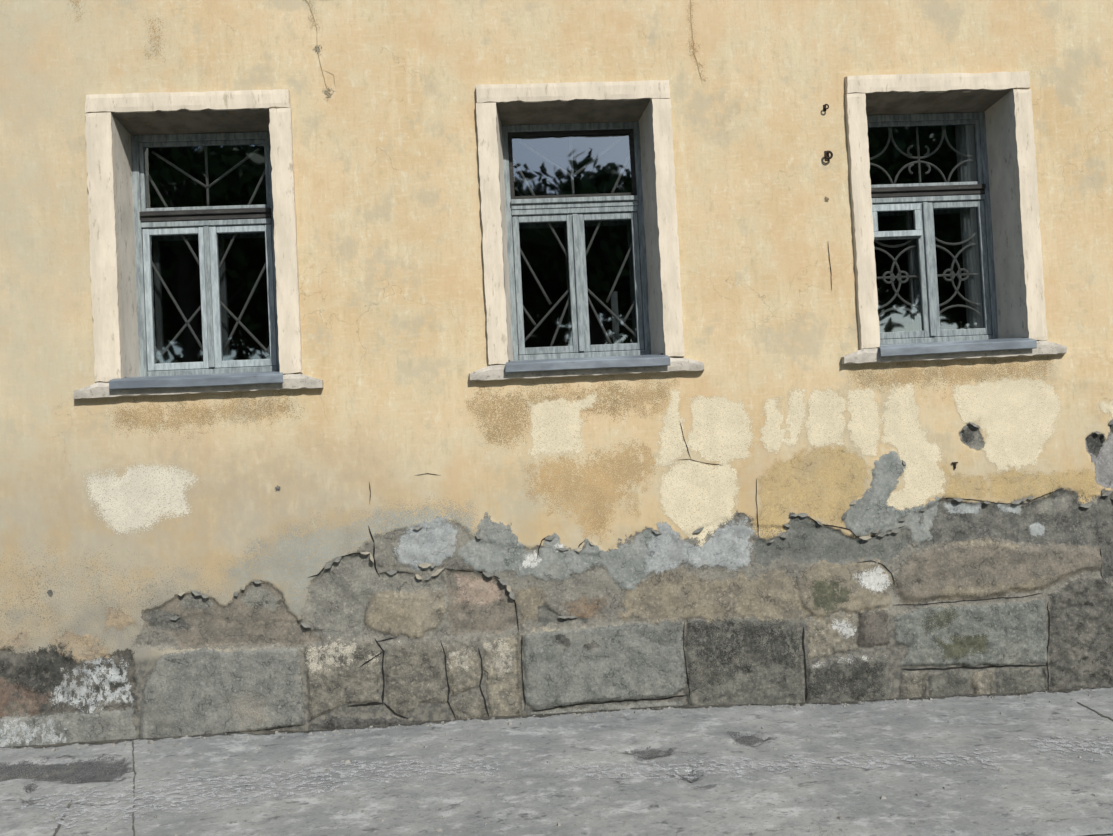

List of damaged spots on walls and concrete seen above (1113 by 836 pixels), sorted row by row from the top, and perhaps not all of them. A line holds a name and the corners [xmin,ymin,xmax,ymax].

crack [305,0,335,98]
crack [685,0,708,80]
damp [0,491,478,699]
spalling [0,419,1113,720]
damp [0,713,69,748]